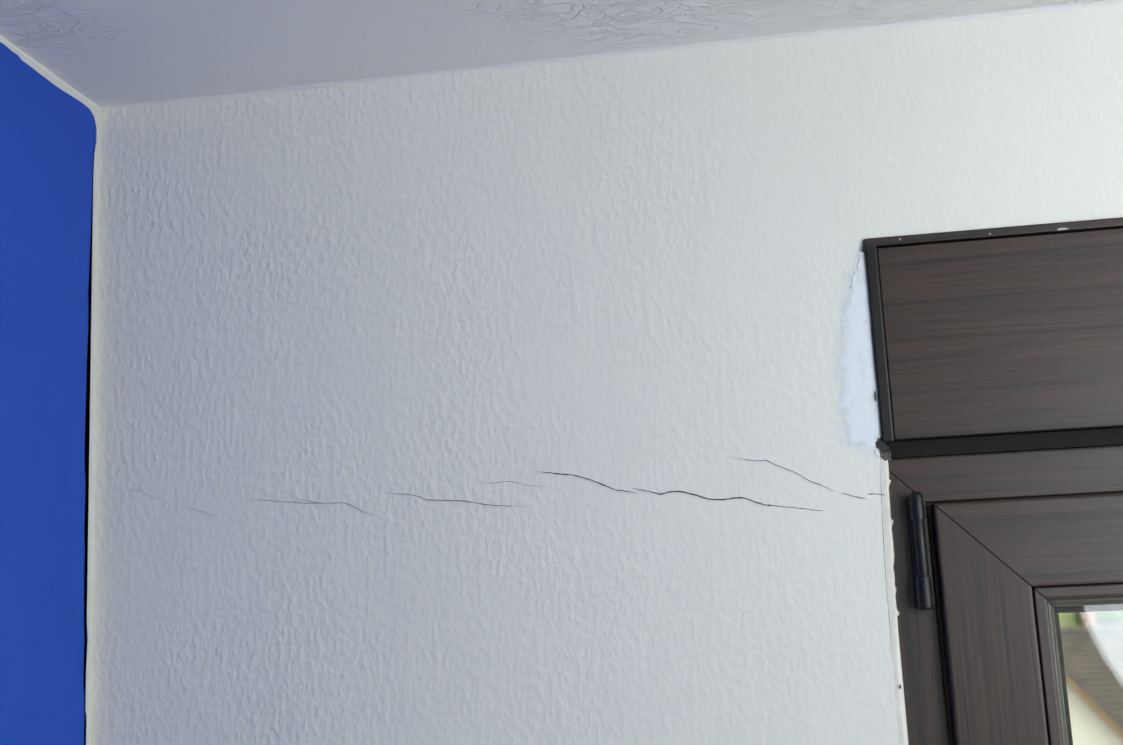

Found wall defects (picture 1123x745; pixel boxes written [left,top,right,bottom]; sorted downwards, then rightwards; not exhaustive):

crack [255,456,892,651]